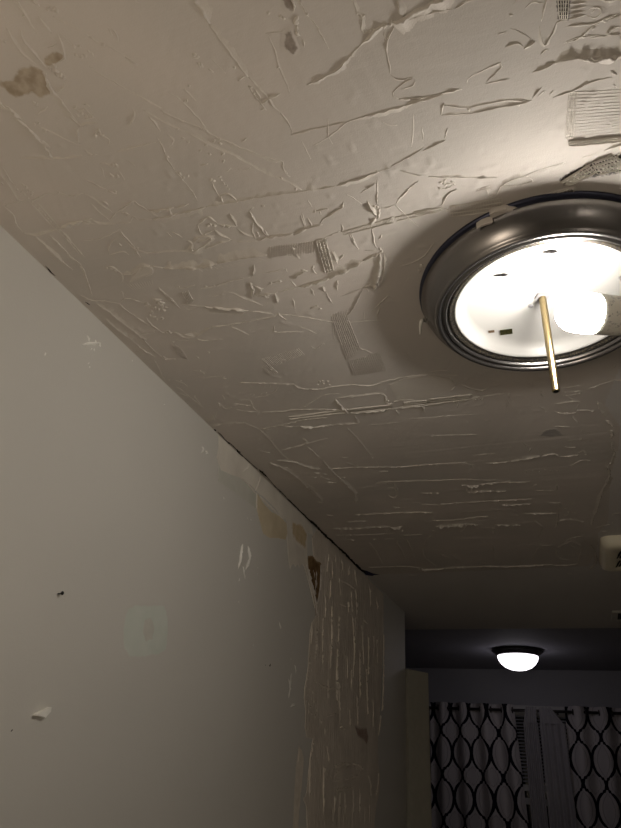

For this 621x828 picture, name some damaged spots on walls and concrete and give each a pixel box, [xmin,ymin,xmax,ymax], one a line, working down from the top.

spalling [266,0,305,58]
peeling [0,47,68,104]
crack [214,429,366,573]
spalling [306,556,322,614]